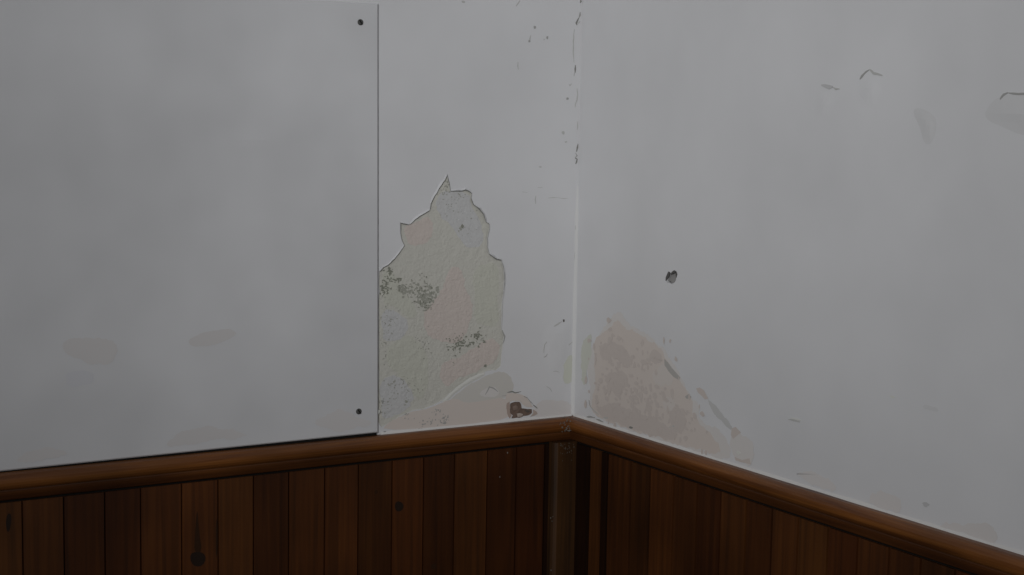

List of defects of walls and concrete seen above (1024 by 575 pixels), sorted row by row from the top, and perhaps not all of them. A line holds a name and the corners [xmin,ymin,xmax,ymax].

peeling [378,174,506,427]
leakage [315,267,571,432]
hole [510,402,532,418]
leakage [563,312,755,466]